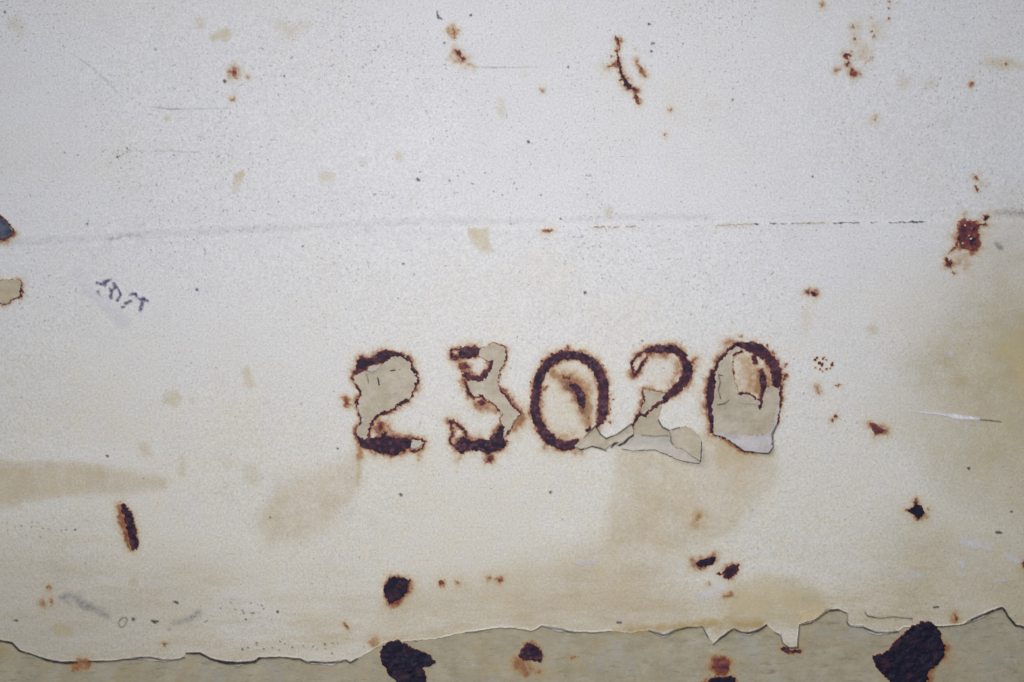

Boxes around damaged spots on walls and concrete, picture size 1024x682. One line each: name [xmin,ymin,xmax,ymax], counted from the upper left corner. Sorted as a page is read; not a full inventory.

rust [944,215,989,275]
peeling [0,279,24,305]
rust [446,342,614,464]
peeling [574,426,702,463]
peeling [715,404,780,453]
peeling [0,605,1024,682]